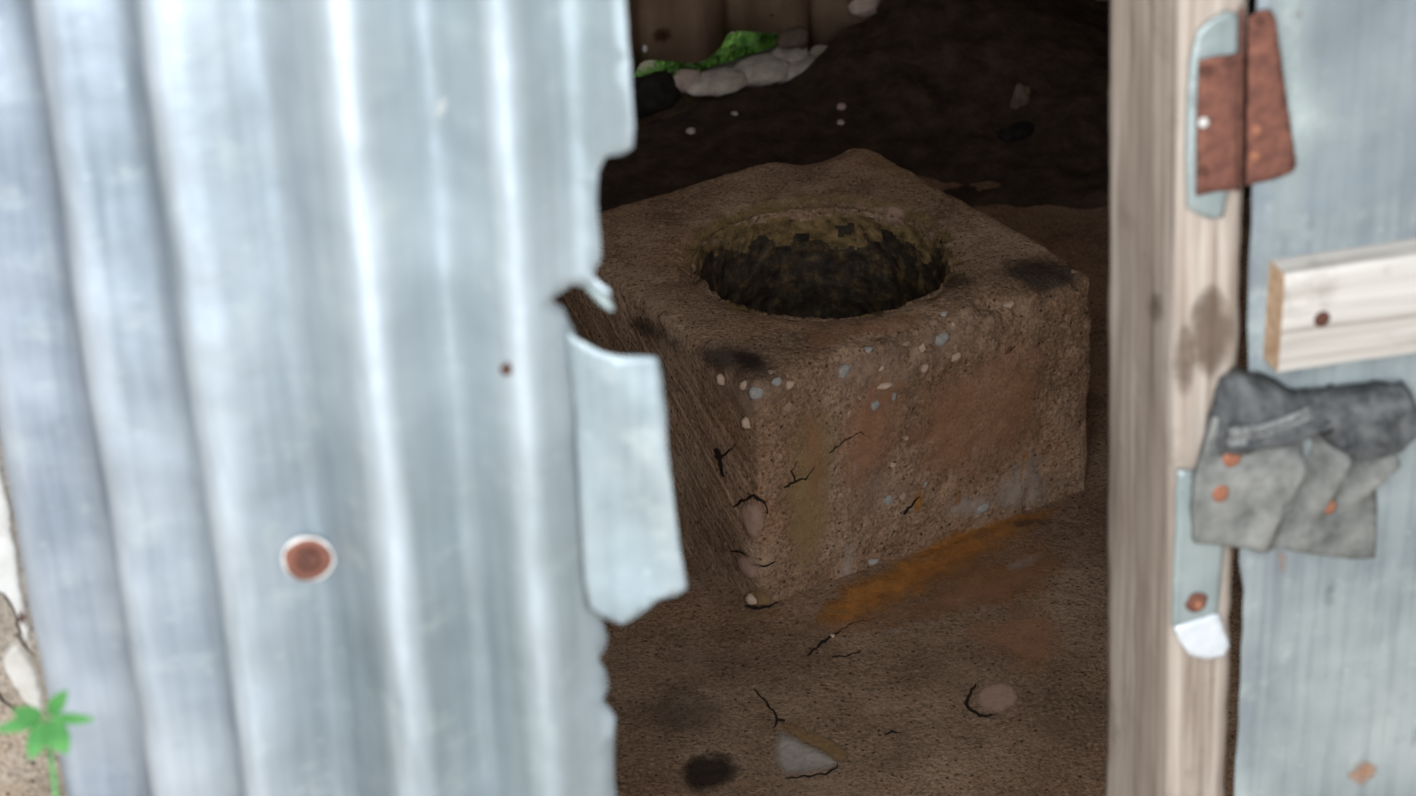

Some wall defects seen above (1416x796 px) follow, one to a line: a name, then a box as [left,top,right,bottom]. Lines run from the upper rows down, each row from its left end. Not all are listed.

crack [714,444,736,477]
crack [784,431,865,488]
crack [903,496,920,515]